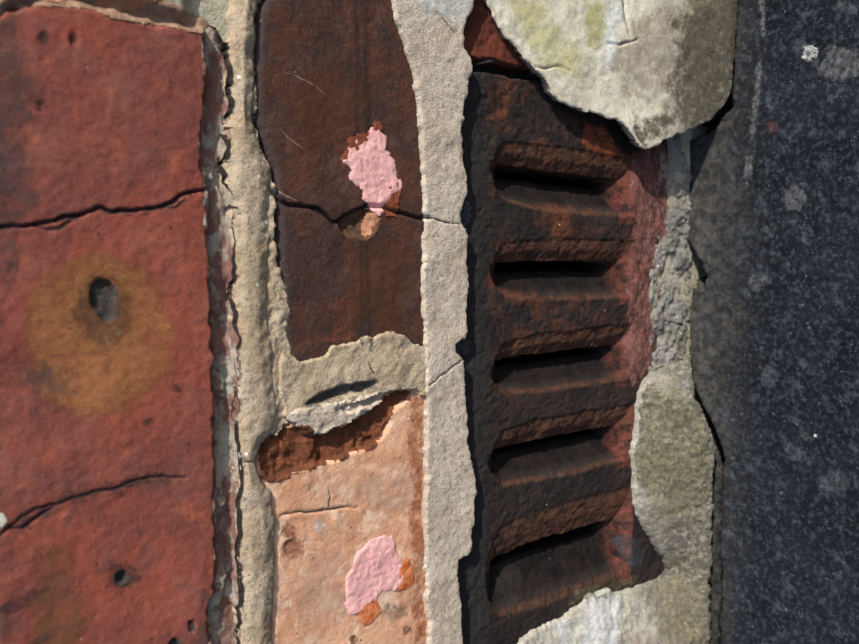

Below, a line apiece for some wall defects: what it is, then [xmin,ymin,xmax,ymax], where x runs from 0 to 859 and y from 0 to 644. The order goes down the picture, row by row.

spalling [340,121,382,170]
crack [10,190,202,231]
crack [268,189,454,225]
spalling [338,183,402,241]
corrosion [26,254,174,415]
spalling [0,0,245,644]
spalling [258,390,410,483]
crack [1,476,186,535]
spalling [358,600,381,626]